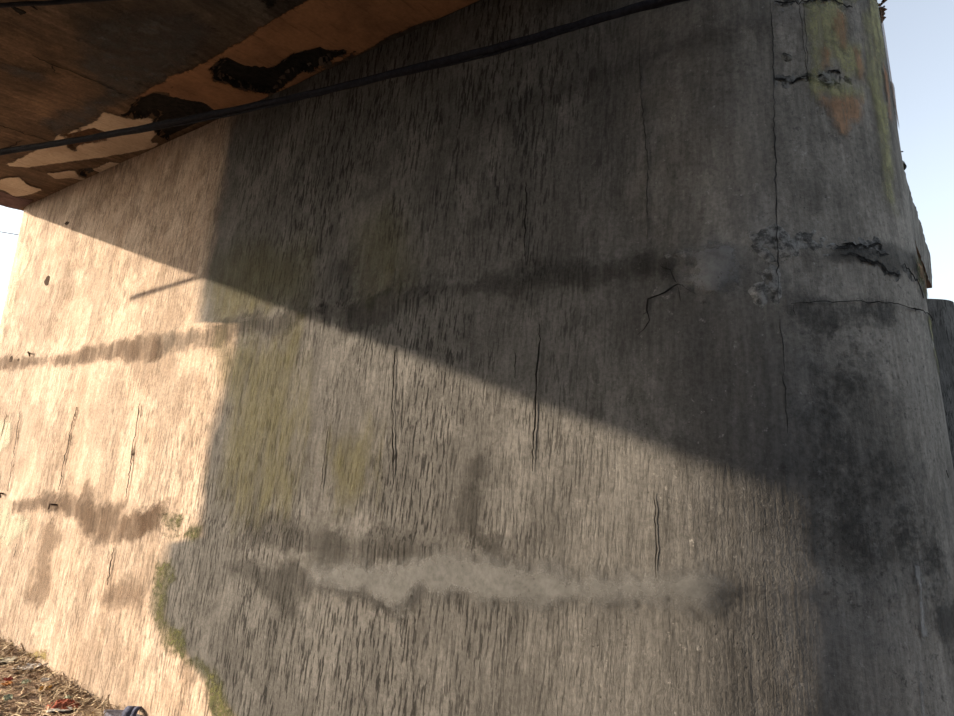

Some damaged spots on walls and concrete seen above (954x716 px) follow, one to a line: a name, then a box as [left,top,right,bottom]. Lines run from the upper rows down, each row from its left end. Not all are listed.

peeling [0,0,479,197]
crack [774,64,842,93]
corrosion [881,13,899,125]
crack [637,266,695,335]
spalling [748,223,837,308]
crack [791,236,933,321]
leakage [1,356,38,369]
leakage [54,335,139,366]
leakage [0,480,161,545]